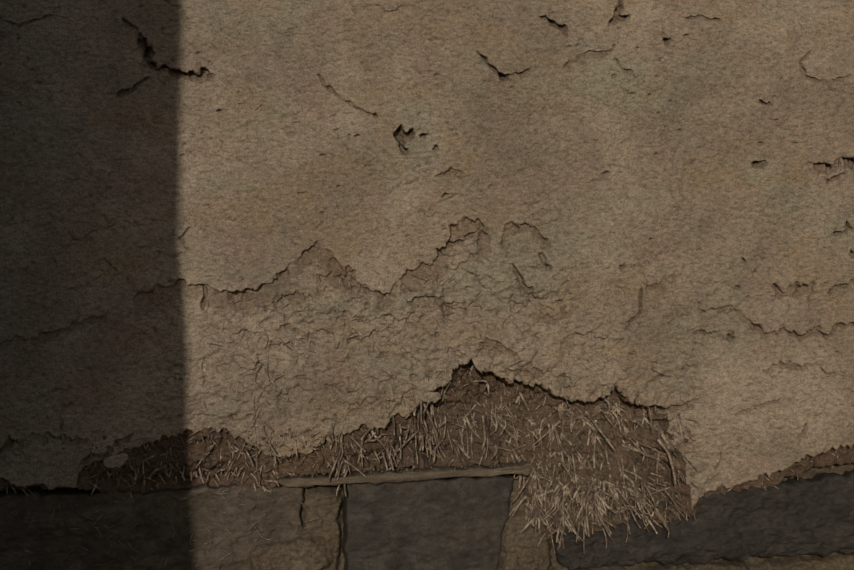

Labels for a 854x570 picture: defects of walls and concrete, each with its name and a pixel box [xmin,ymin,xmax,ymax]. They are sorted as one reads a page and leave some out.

crack [116,18,216,98]
crack [477,51,531,82]
crack [539,0,635,77]
crack [692,305,854,341]
crack [758,359,837,377]
spalling [0,336,854,554]